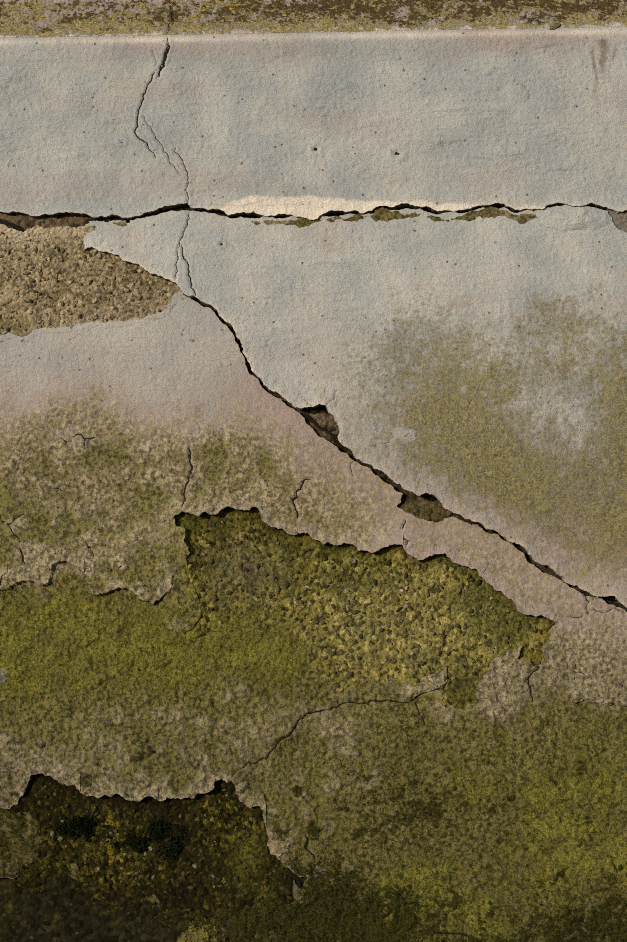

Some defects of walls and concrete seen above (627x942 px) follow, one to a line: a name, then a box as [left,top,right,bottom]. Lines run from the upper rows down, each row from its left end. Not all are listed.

flaking render [0,224,188,343]
crack [0,1,627,618]
flaking render [0,493,575,742]
crack [232,689,439,777]
flaking render [0,759,312,942]